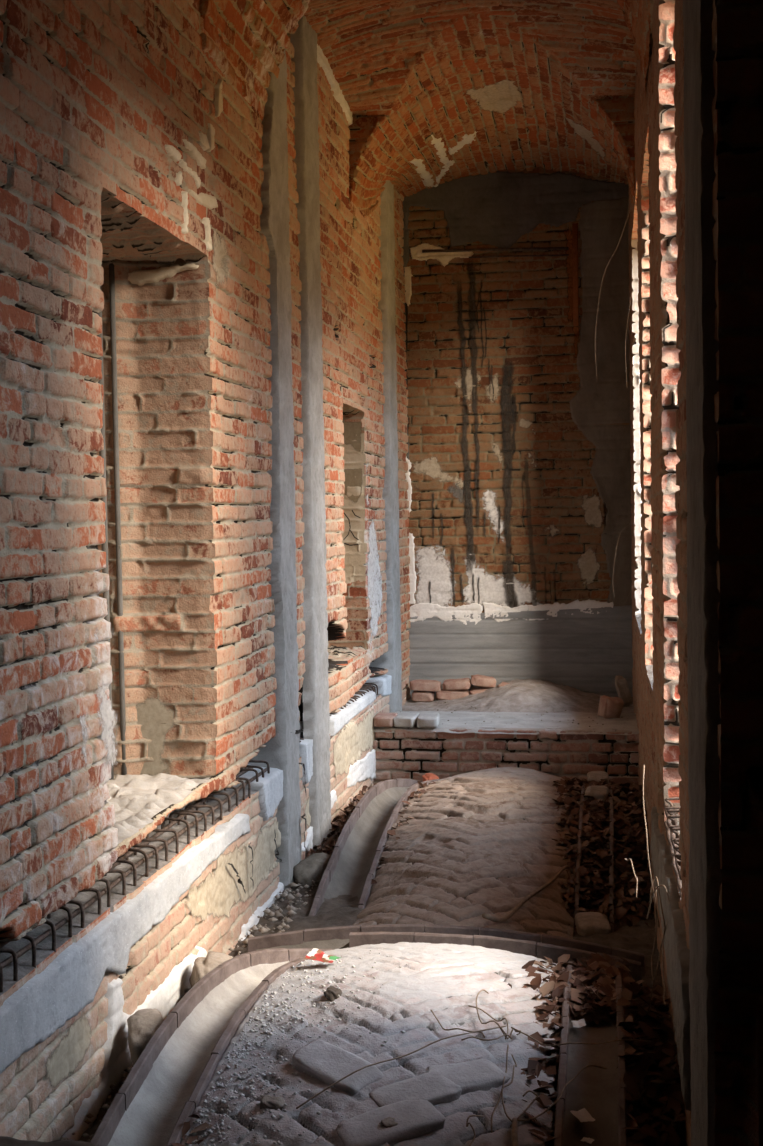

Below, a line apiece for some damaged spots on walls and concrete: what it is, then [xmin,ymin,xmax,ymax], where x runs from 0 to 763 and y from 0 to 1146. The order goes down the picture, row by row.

damp [414,263,559,608]
damp [581,495,608,534]
peeling [408,533,614,625]
damp [578,549,605,585]
peeling [187,820,284,941]